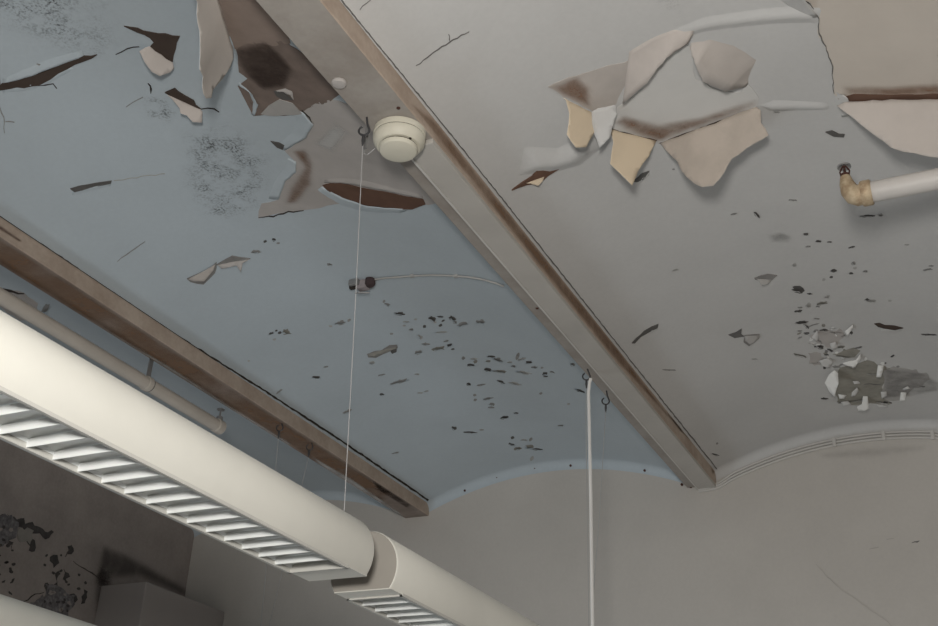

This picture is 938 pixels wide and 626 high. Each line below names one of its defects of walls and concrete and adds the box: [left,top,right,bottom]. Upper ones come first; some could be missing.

peeling [196,0,436,218]
peeling [548,30,768,187]
peeling [781,0,938,158]
crack [341,0,717,469]
peeling [367,333,398,365]
peeling [383,300,484,355]
peeling [462,353,554,385]
spalling [791,286,929,411]
peeling [508,436,543,461]
spalling [0,514,53,595]
spalling [30,546,88,616]